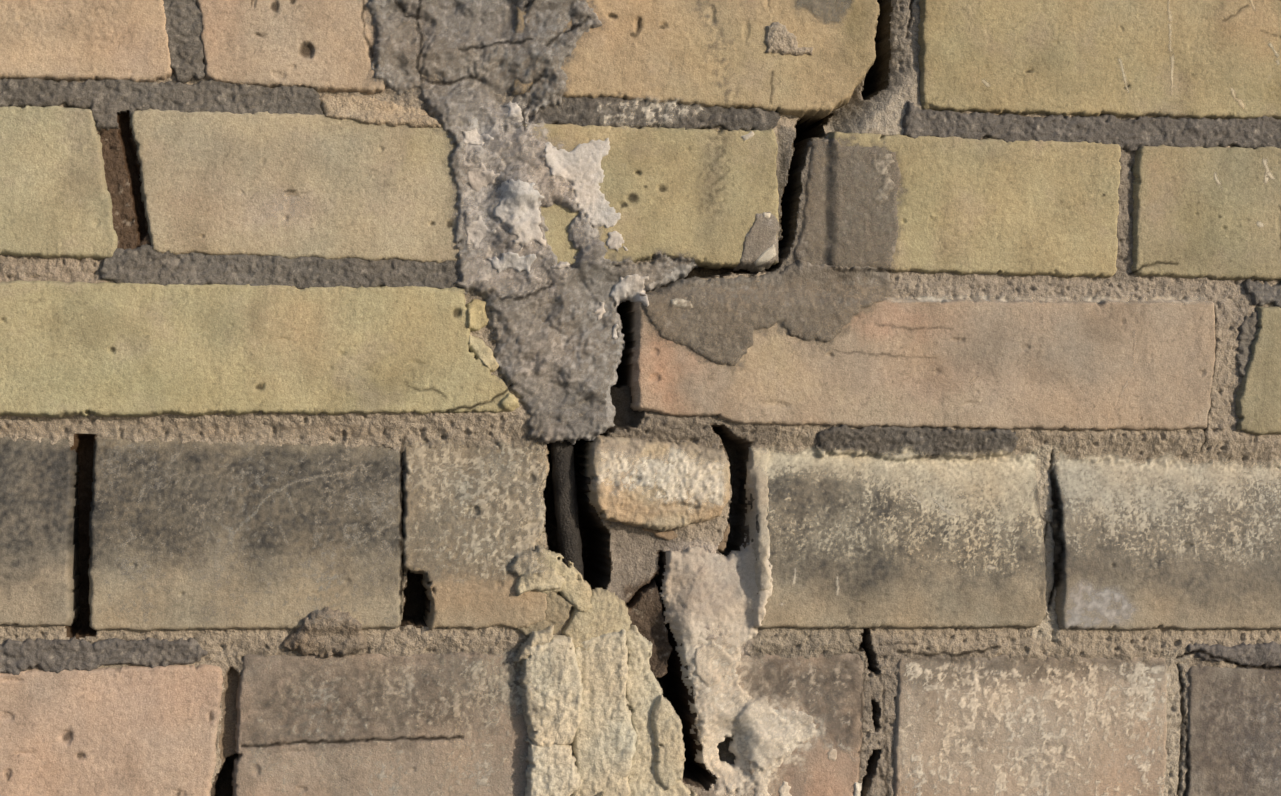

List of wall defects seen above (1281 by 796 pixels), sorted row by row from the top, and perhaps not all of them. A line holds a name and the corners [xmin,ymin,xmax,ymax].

crack [861,0,914,100]
peeling [432,163,547,274]
peeling [544,98,703,252]
crack [650,113,834,292]
peeling [594,274,649,339]
crack [608,384,644,433]
crack [398,436,406,630]
spalling [543,442,559,559]
spalling [573,428,612,590]
crack [710,423,754,557]
crack [625,550,717,791]
flaking render [659,447,837,796]